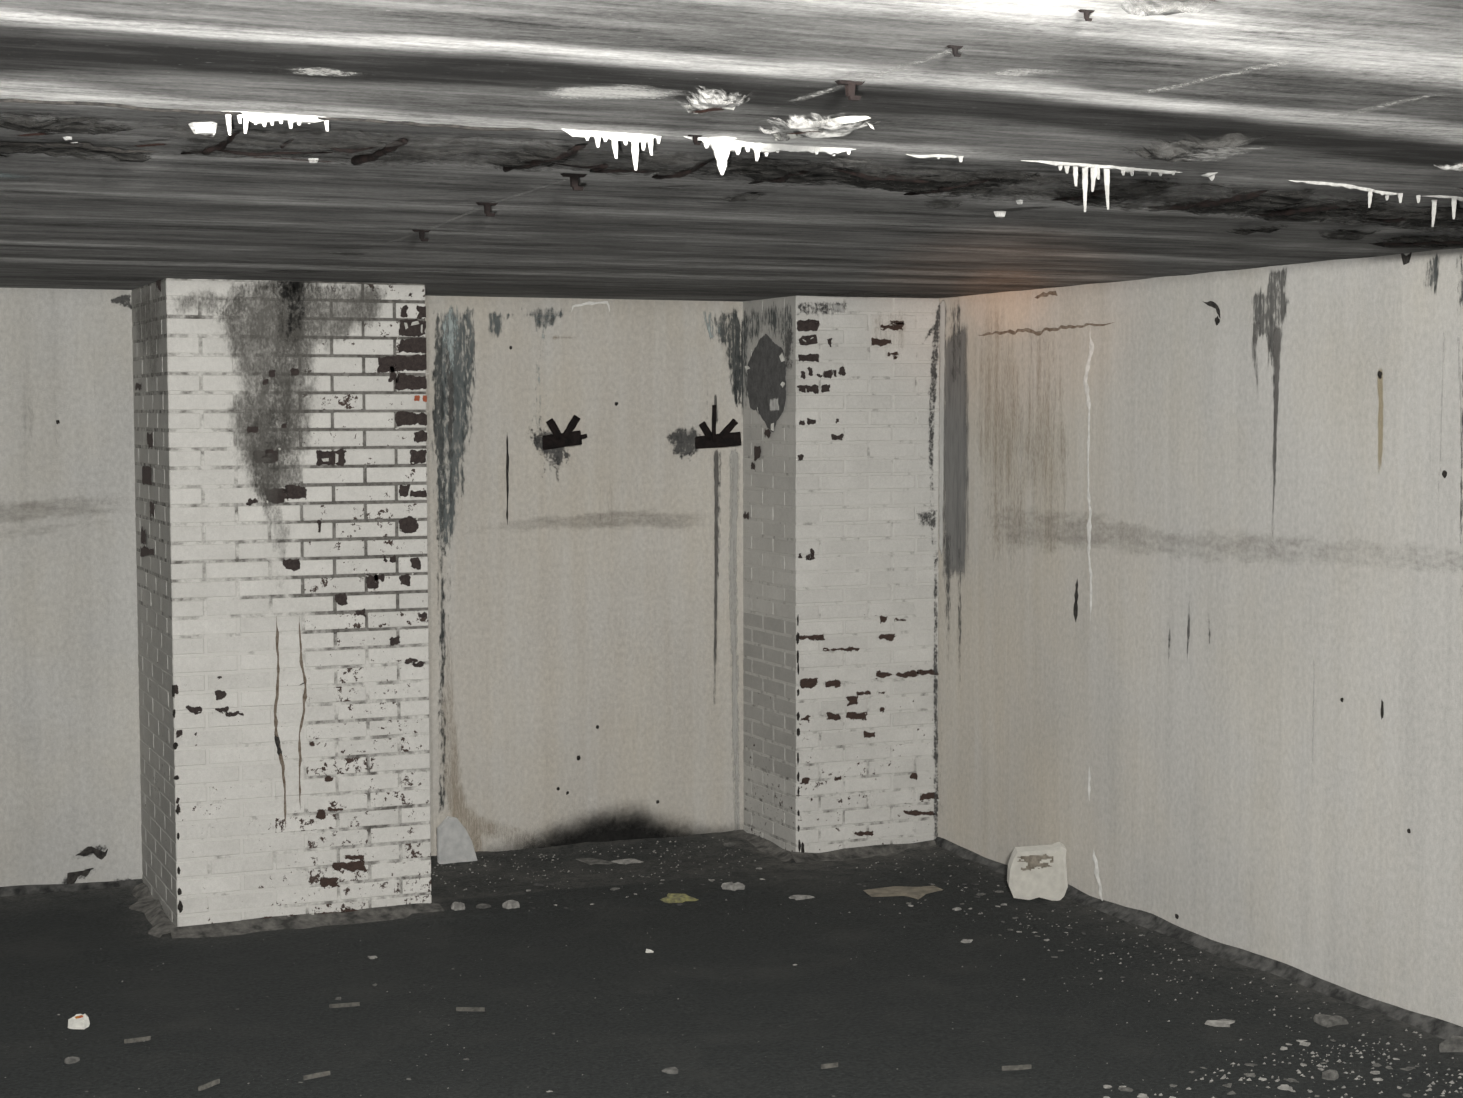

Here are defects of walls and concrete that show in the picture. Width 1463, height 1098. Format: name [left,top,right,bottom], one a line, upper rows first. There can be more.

leakage [562,129,662,171]
spalling [0,113,1463,265]
leakage [684,136,856,175]
leakage [1020,160,1182,212]
leakage [1289,180,1463,227]
leakage [1253,268,1287,504]
peeling [366,555,422,589]
leakage [432,308,510,810]
peeling [172,676,244,749]
crack [274,618,307,828]
peeling [795,615,940,853]
peeling [319,853,367,891]